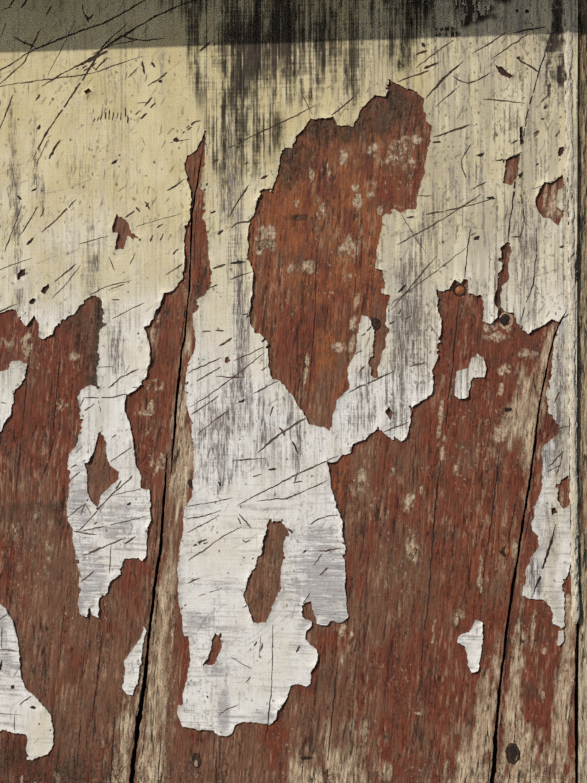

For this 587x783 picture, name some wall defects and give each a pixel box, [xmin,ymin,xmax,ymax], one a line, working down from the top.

crack [52,358,60,423]
crack [54,632,103,783]
crack [100,134,206,783]
peeling [0,130,561,783]
crack [482,312,572,783]
peeling [494,343,576,783]
crack [566,157,585,285]